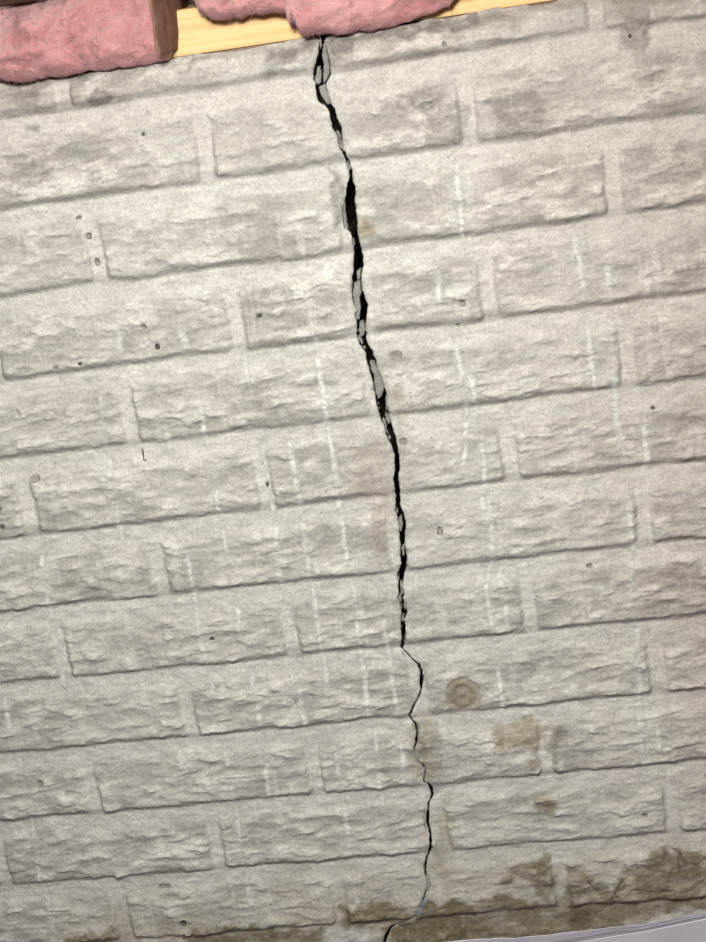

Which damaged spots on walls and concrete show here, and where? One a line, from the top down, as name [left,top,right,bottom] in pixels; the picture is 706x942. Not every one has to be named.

damp [185,553,215,690]
damp [288,440,329,684]
crack [313,35,433,899]
crack [383,924,396,942]